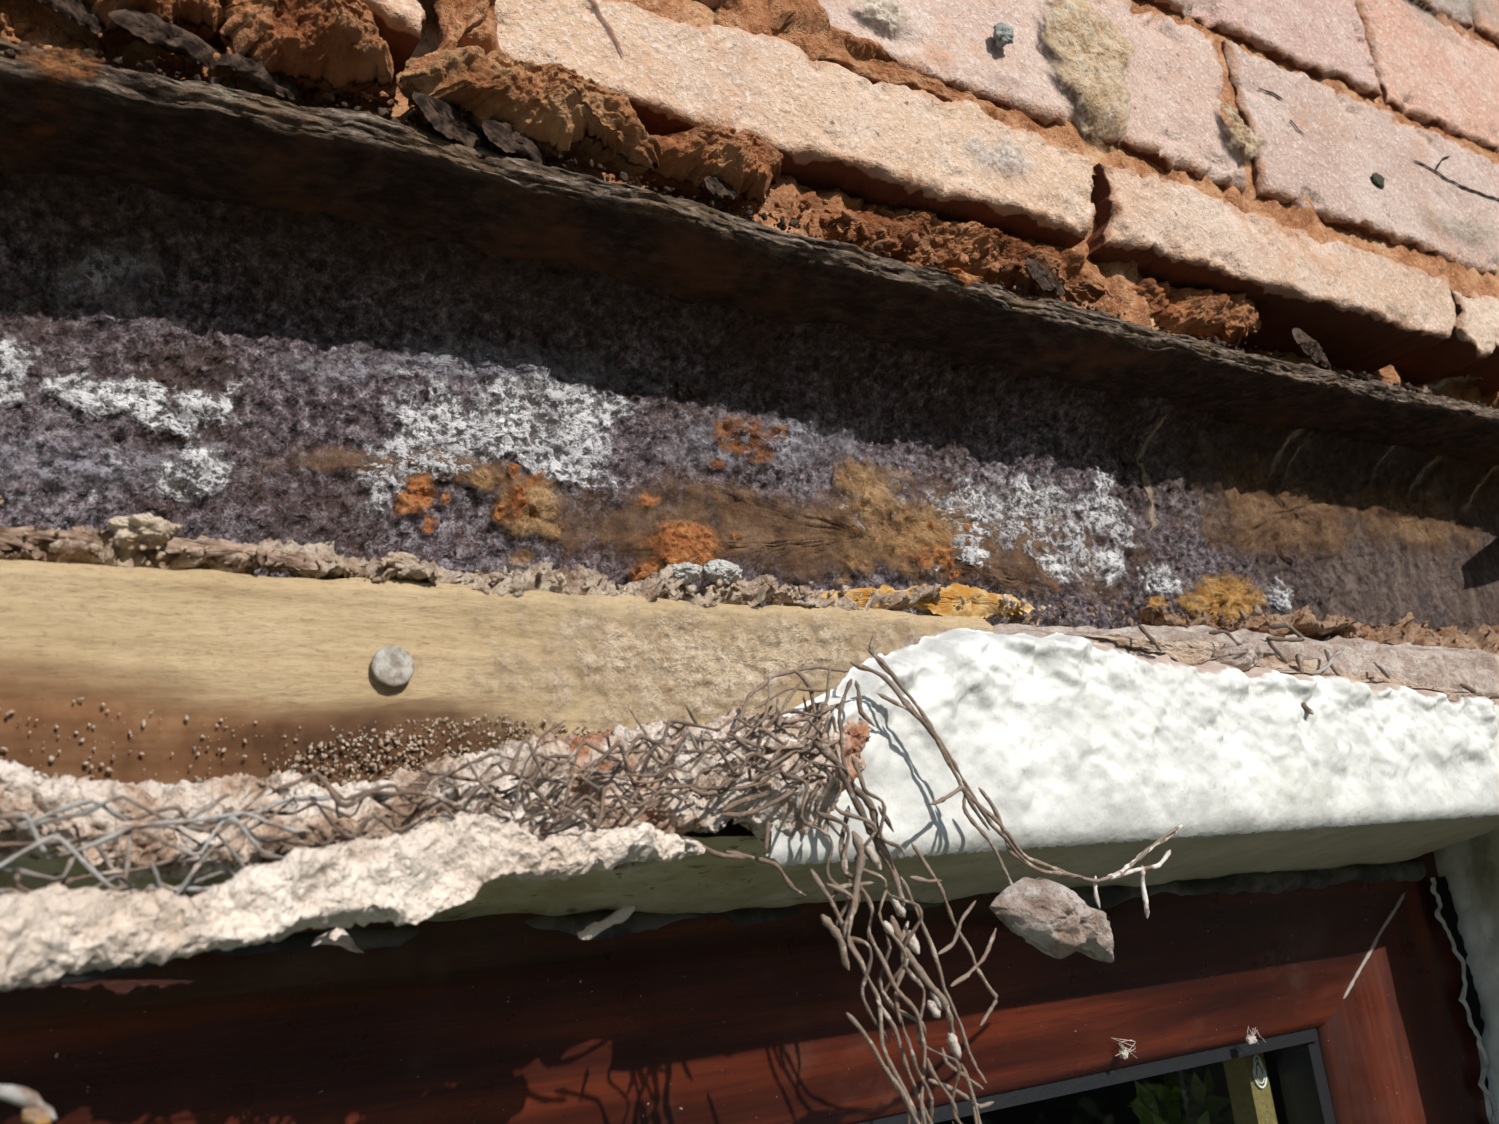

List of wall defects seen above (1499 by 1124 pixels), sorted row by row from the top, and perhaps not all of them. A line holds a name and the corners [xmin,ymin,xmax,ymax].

rust [23,45,100,83]
rust [38,0,301,100]
rust [412,91,545,165]
rust [704,176,738,200]
rust [943,267,982,285]
rust [1292,328,1332,371]
rust [305,415,1093,619]
rust [1148,575,1267,622]
spalling [1068,632,1226,664]
spalling [1254,653,1499,705]
spalling [0,701,871,884]
crack [1430,876,1498,1124]